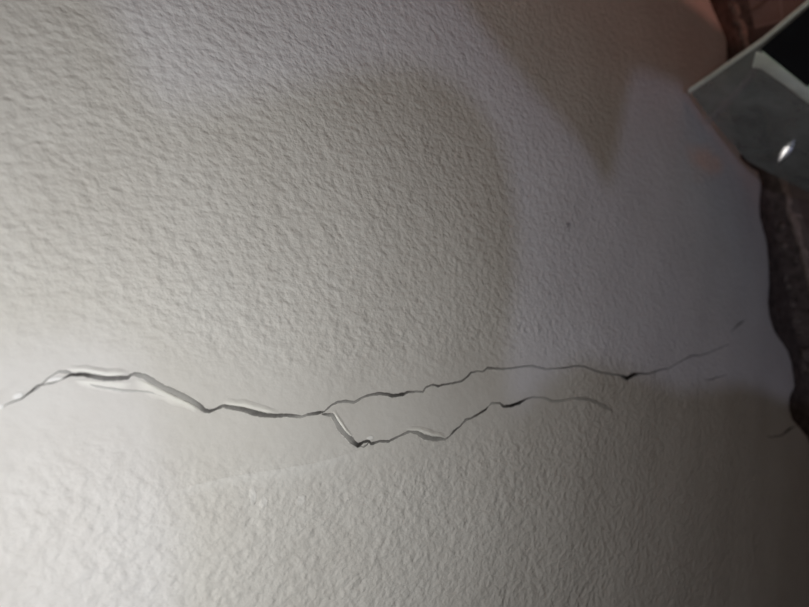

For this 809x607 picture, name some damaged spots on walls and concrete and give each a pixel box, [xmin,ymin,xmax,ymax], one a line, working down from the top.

crack [0,320,745,448]